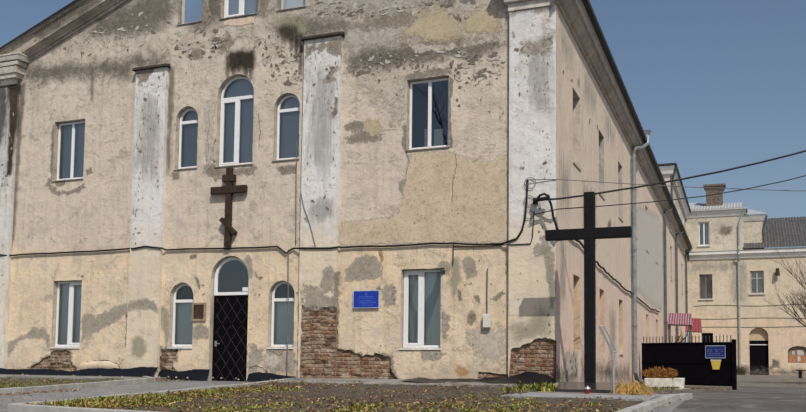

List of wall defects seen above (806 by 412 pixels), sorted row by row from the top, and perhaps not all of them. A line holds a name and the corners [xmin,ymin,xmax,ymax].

damp [227,50,254,78]
peeling [512,31,553,99]
damp [0,56,162,240]
flaking render [277,154,311,185]
spalling [27,348,77,371]
spalling [159,346,181,372]
spalling [247,271,398,379]
spalling [478,314,578,382]